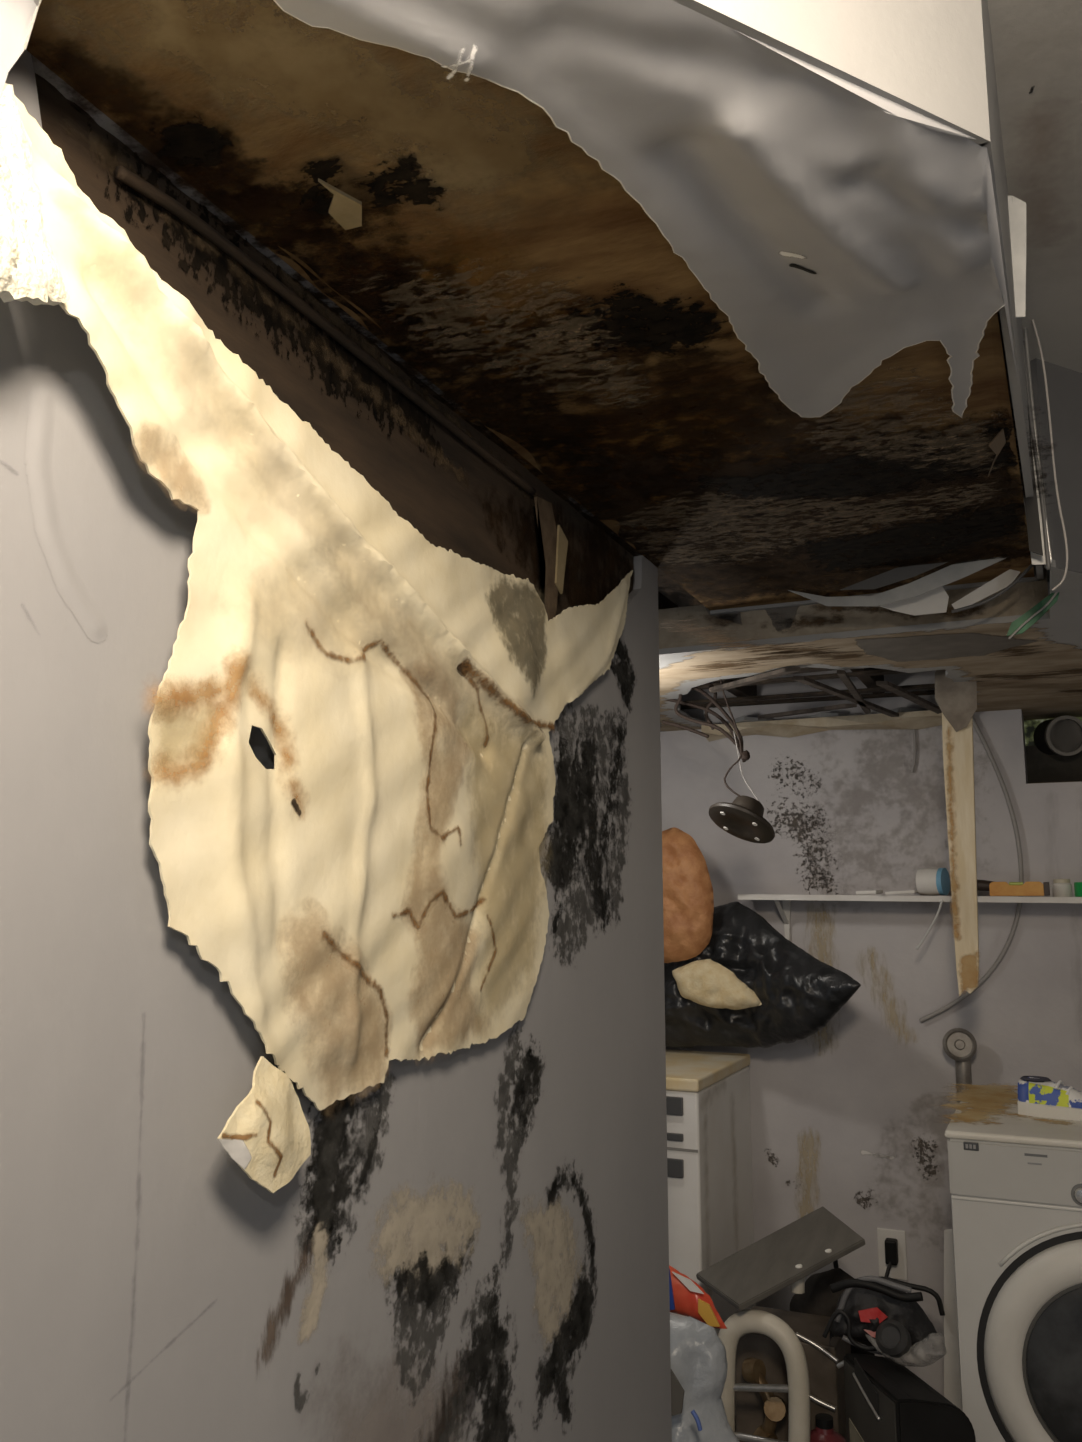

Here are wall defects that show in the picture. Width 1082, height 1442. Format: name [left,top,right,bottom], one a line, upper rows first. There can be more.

peeling [0,0,40,97]
water stain [38,0,1053,607]
peeling [275,0,1018,565]
water stain [483,498,546,692]
water stain [322,931,388,1055]
water stain [306,623,462,845]
water stain [393,890,497,990]
water stain [461,638,635,965]
water stain [767,757,838,895]
water stain [258,1074,395,1360]
water stain [344,1027,545,1442]
water stain [534,1162,598,1433]